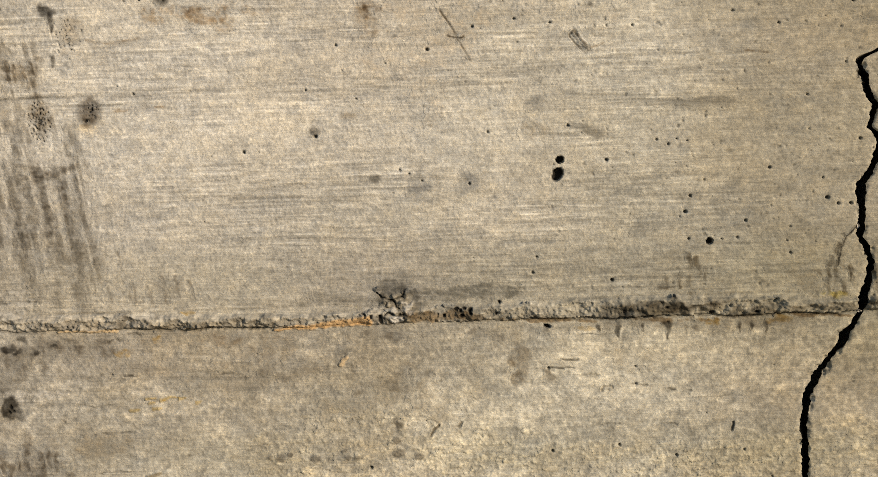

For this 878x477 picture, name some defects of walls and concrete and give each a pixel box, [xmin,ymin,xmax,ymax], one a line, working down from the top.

water stain [0,34,494,431]
water stain [421,280,546,305]
water stain [656,251,708,298]
water stain [783,240,857,300]
crack [799,48,878,477]
water stain [417,310,835,397]